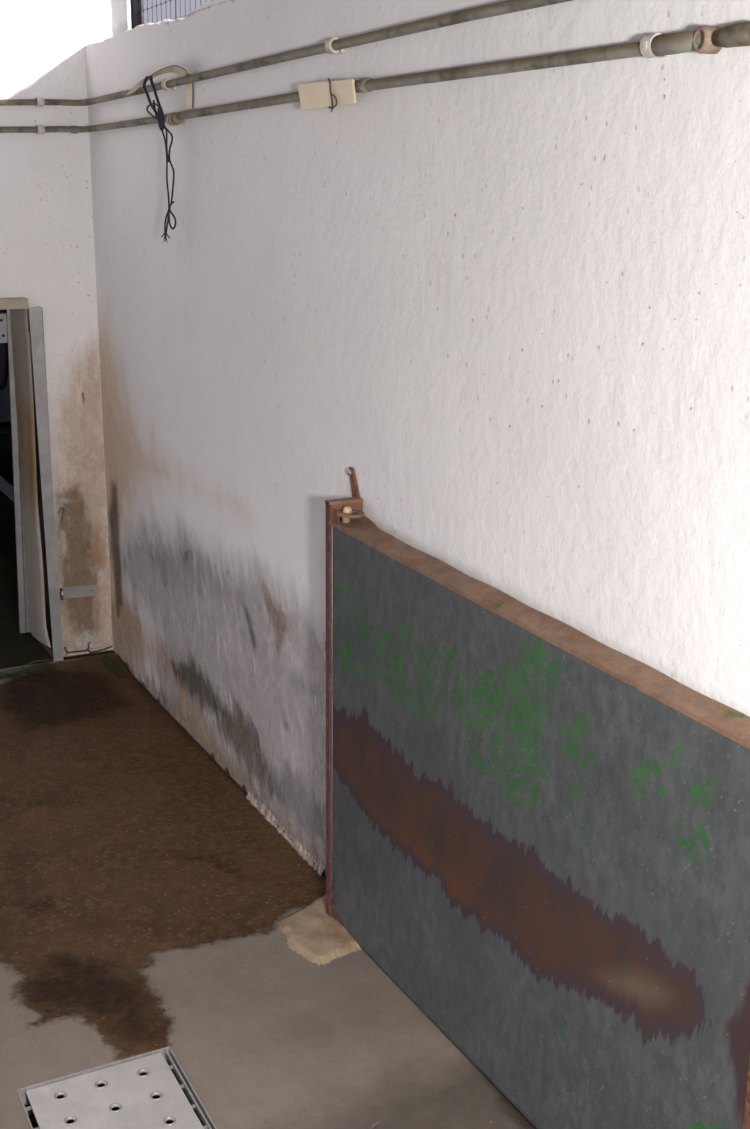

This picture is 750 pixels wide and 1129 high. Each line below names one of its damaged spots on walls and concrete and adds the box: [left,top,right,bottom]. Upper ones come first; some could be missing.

water stain [0,486,333,1059]